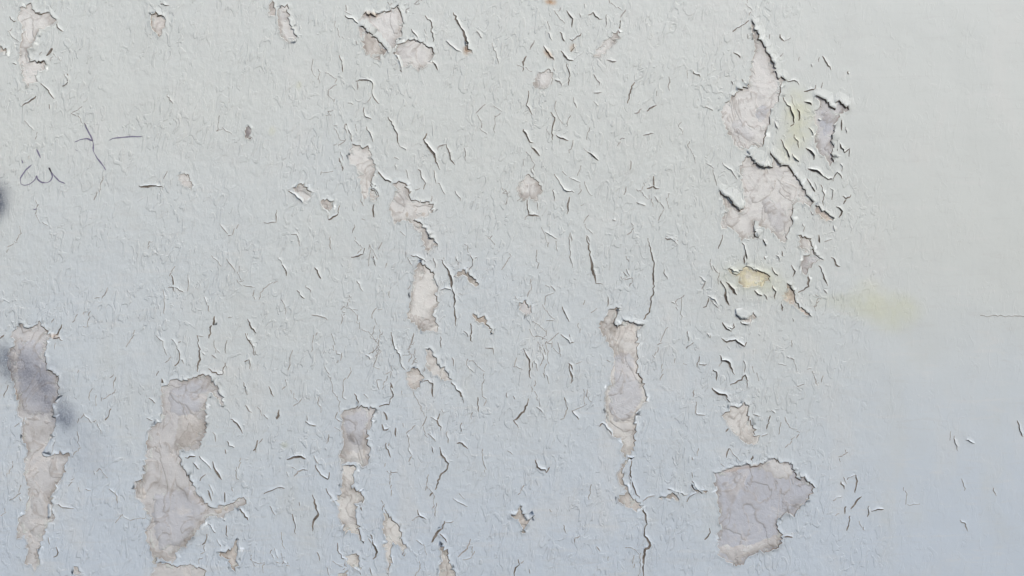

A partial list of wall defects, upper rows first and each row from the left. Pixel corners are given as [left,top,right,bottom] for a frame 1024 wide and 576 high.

crack [8,16,89,159]
crack [0,288,108,349]
peeling [346,141,456,393]
crack [126,0,852,576]
peeling [716,13,838,320]
peeling [4,317,74,574]
crack [47,370,146,558]
peeling [131,370,250,576]
peeling [329,400,381,573]
peeling [595,303,819,570]
crack [833,450,920,531]
crack [1016,420,1024,437]